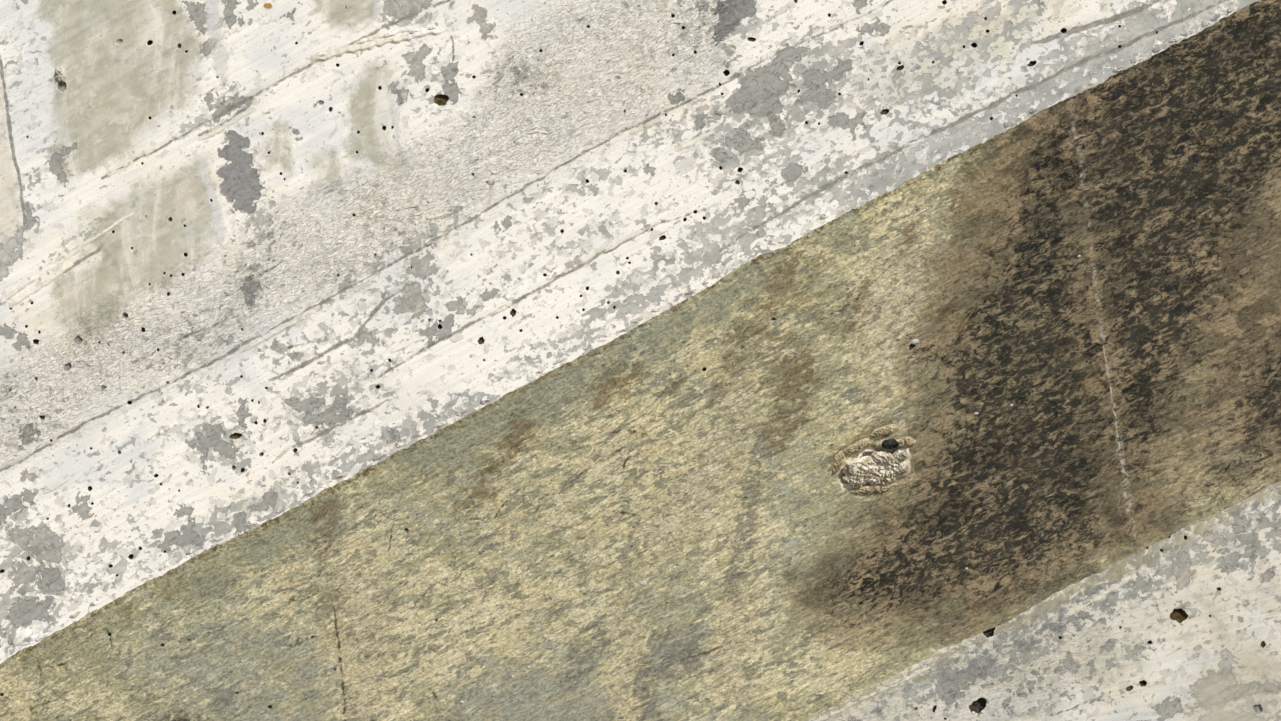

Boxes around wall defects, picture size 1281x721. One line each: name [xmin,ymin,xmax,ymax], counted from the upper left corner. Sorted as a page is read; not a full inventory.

crack [349,0,450,45]
peeling [708,0,757,46]
peeling [204,92,267,214]
peeling [714,43,867,163]
peeling [781,158,808,184]
crack [0,28,836,474]
crack [820,264,892,320]
water stain [845,216,944,410]
spalling [829,421,916,499]
water stain [1100,321,1136,537]
peeling [0,470,65,638]
crack [290,594,374,721]